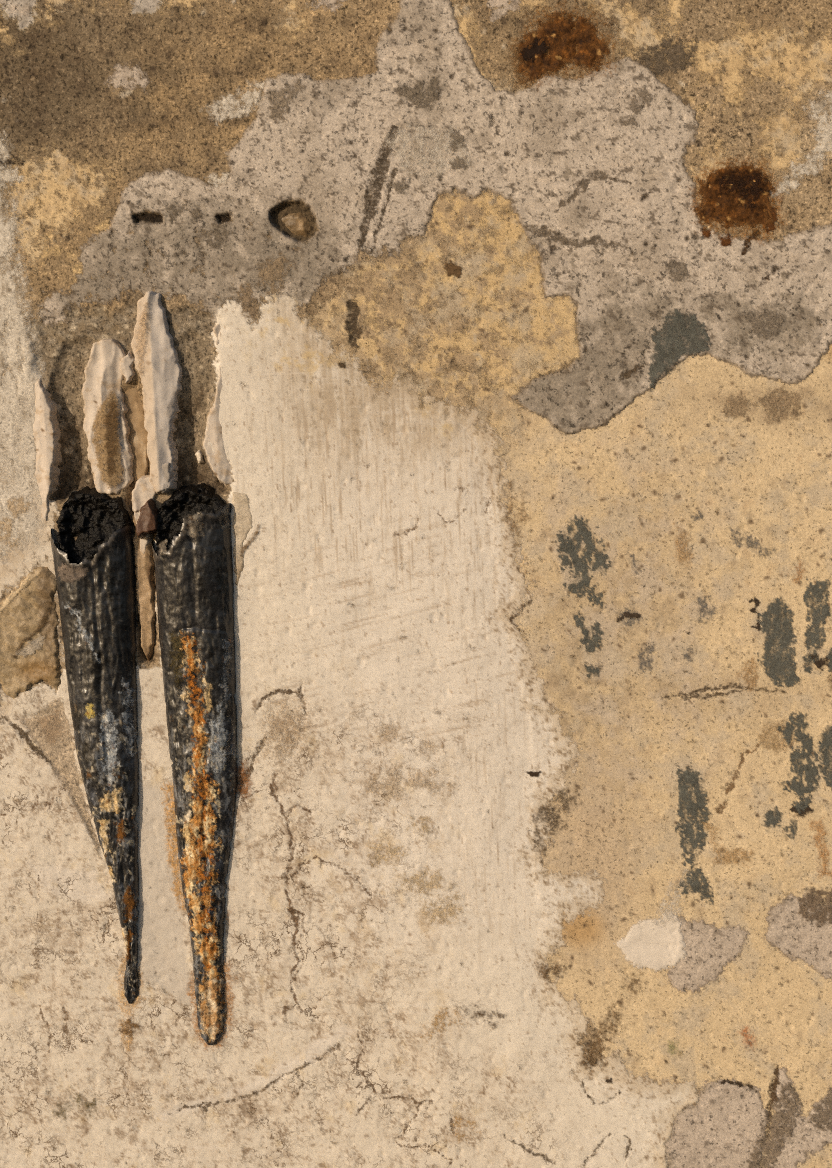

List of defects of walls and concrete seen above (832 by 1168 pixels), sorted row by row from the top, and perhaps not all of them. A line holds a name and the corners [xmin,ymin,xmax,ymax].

rust [514,10,616,84]
rust [693,160,781,246]
flaking render [82,291,182,524]
flaking render [203,366,232,486]
flaking render [140,534,157,554]
crack [257,687,304,710]
rust [161,630,233,1047]
crack [243,737,371,1014]
rust [118,887,142,1051]